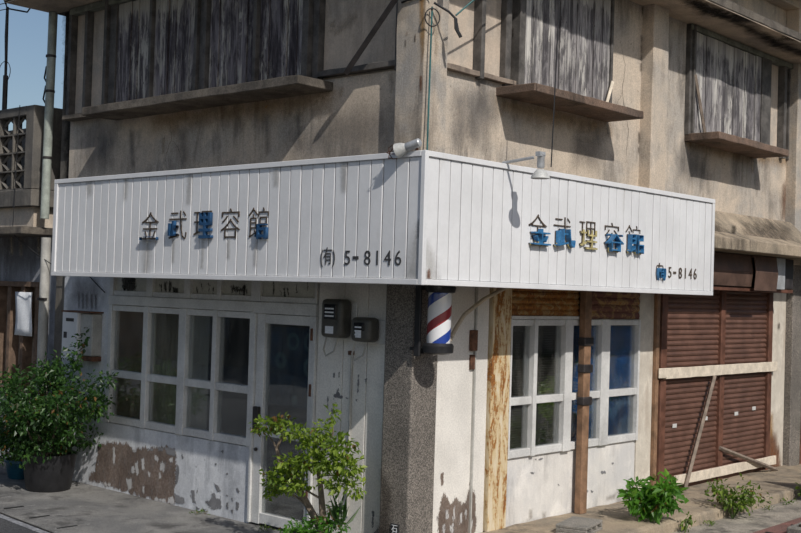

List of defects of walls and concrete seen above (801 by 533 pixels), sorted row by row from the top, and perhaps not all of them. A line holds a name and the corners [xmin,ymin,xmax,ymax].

damp [687,0,801,56]
peeling [89,442,239,514]
peeling [437,472,477,533]